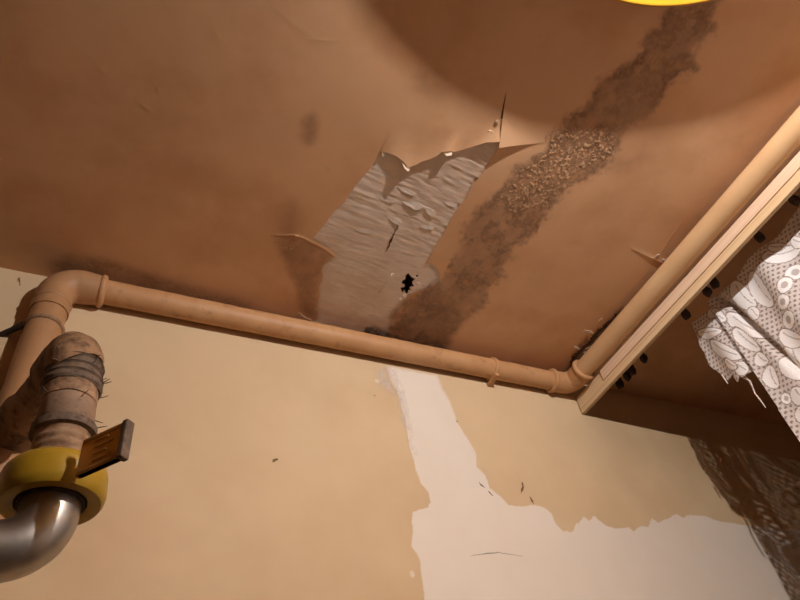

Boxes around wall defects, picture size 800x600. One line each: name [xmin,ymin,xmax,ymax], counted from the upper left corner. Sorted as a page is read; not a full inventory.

peeling [298,111,502,337]
leakage [364,220,506,348]
leakage [478,2,712,237]